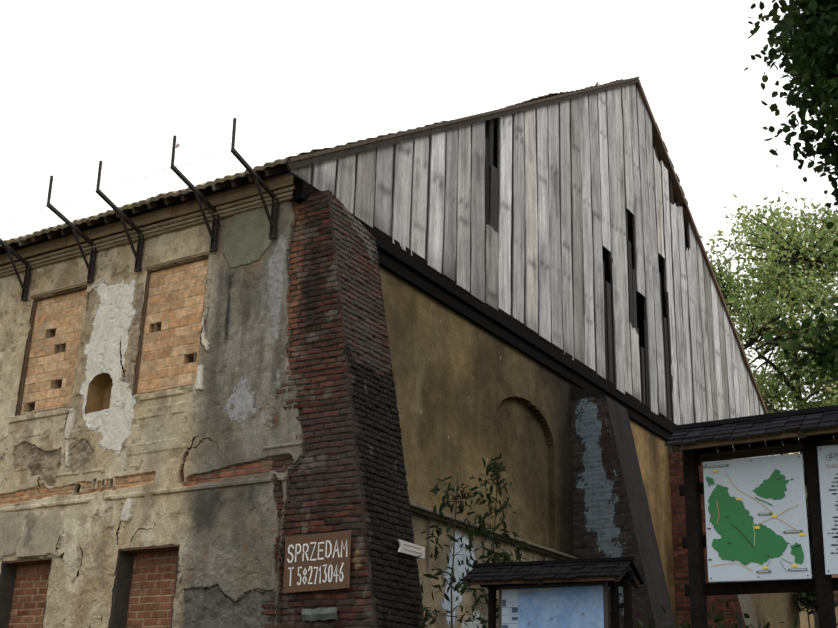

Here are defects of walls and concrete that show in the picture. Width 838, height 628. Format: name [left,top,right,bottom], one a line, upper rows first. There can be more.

flaking render [83,288,98,330]
flaking render [121,282,145,393]
peeling [223,376,259,423]
flaking render [0,407,156,560]
flaking render [181,453,294,488]
peeling [574,397,626,558]
crack [179,583,272,603]